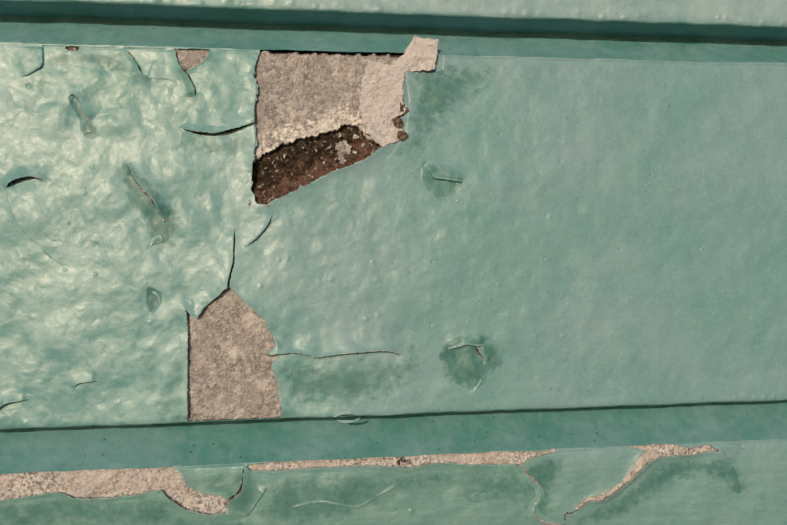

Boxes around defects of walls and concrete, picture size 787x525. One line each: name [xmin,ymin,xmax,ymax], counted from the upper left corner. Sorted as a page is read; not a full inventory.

peeling [21,46,213,105]
spalling [177,35,501,247]
crack [224,226,235,288]
peeling [157,285,424,423]
peeling [0,449,555,525]
peeling [570,443,747,525]